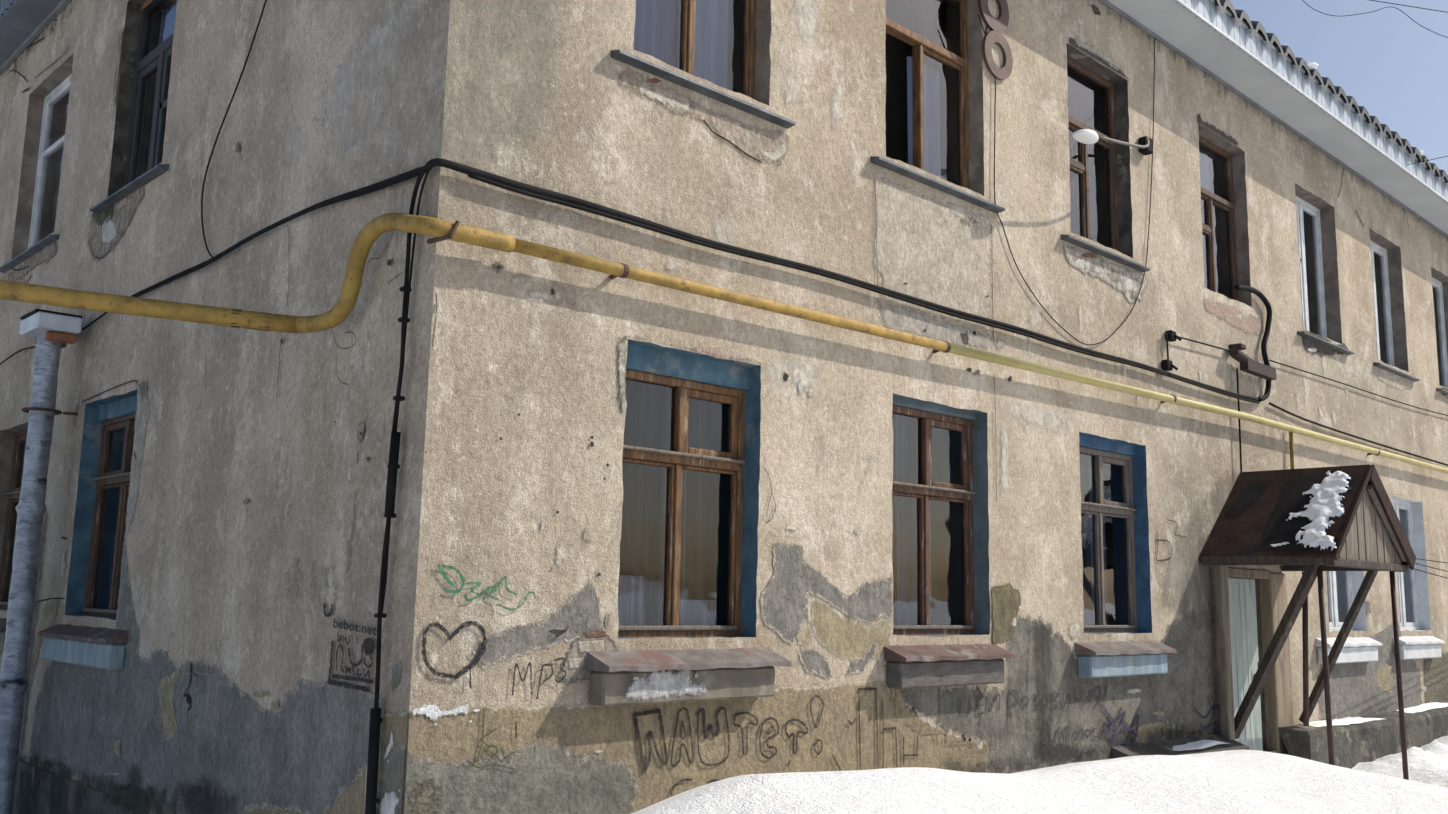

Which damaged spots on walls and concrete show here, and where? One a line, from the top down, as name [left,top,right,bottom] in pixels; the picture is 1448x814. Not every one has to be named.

spalling [619,67,790,166]
spalling [88,185,144,261]
spalling [1064,244,1148,303]
peeling [29,380,639,814]
peeling [760,526,893,679]
peeling [901,583,1220,773]